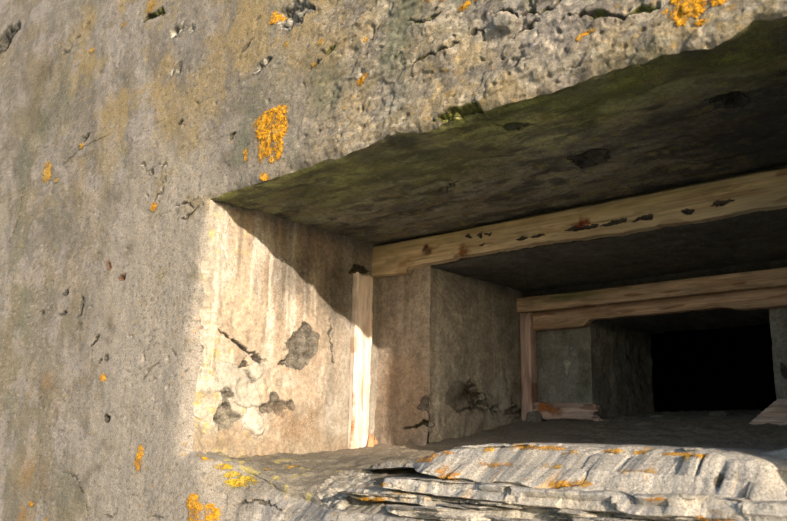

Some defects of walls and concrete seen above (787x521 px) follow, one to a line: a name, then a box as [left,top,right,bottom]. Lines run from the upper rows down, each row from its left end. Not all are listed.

spalling [0,20,21,53]
spalling [277,0,316,33]
crack [394,0,661,63]
spalling [253,57,272,74]
crack [219,331,260,368]
spalling [280,321,320,370]
flaking render [213,360,295,430]
spalling [456,379,522,418]